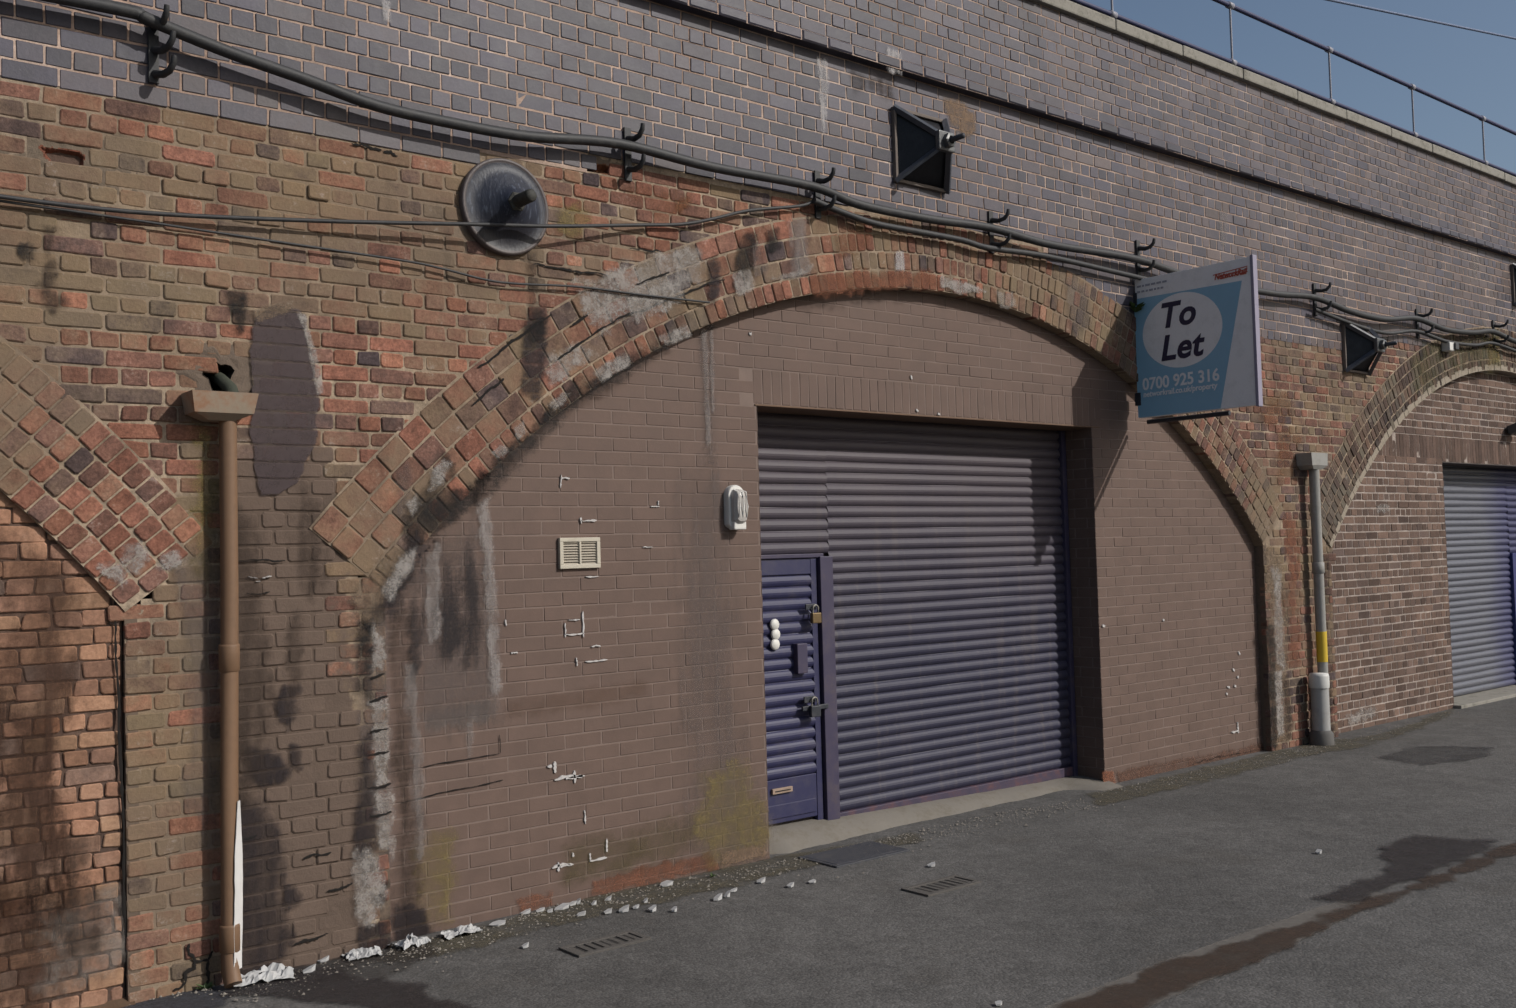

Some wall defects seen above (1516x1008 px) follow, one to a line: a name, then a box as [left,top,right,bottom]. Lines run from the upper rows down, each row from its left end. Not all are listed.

leakage [523,251,582,399]
leakage [582,248,721,330]
leakage [222,500,500,1008]
leakage [0,871,79,1008]